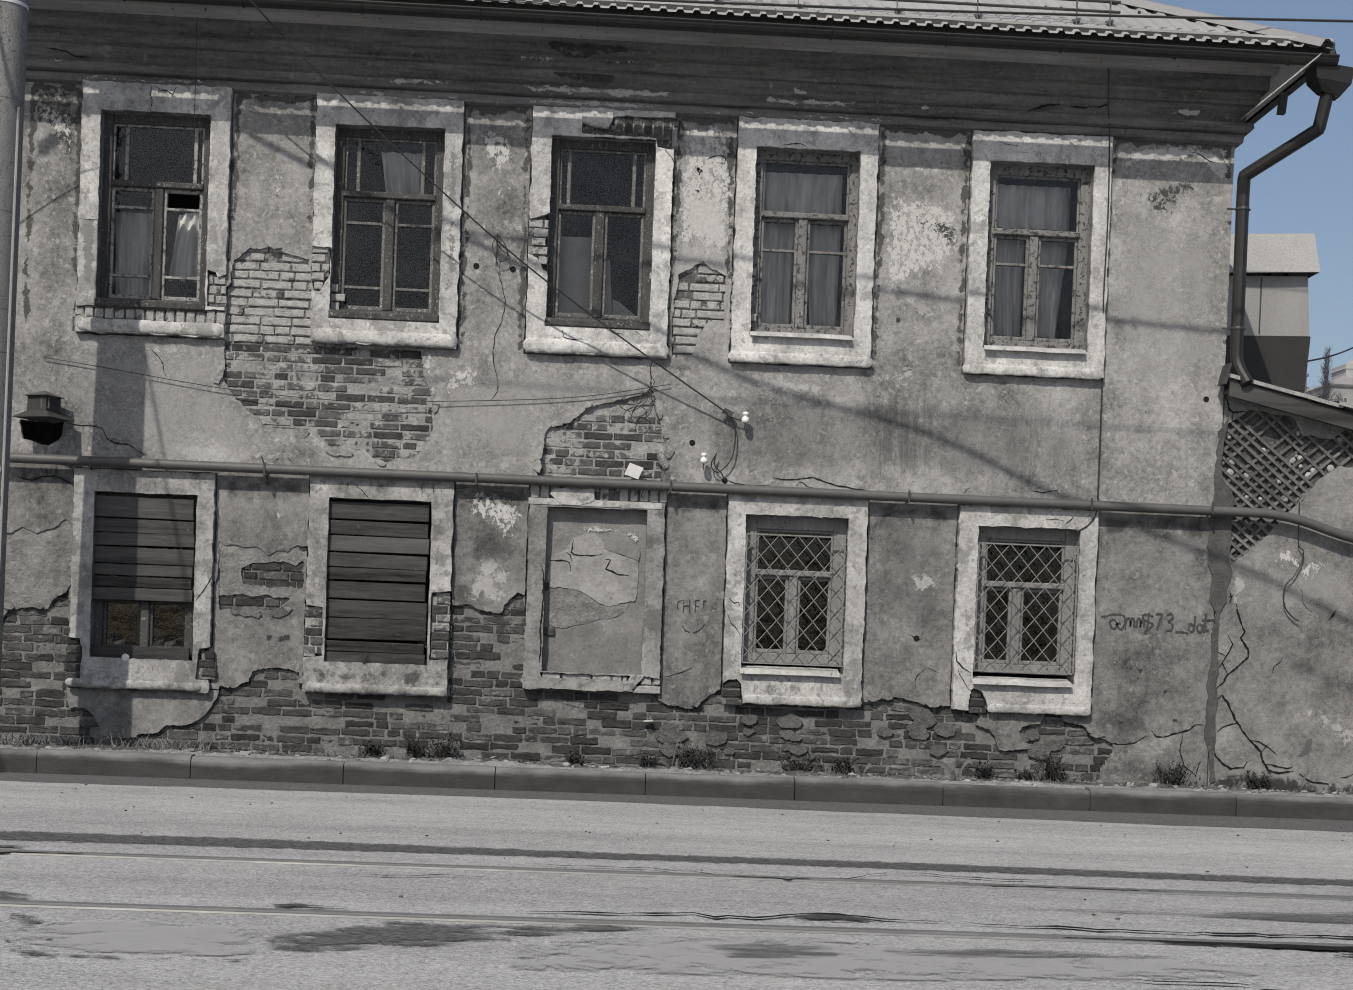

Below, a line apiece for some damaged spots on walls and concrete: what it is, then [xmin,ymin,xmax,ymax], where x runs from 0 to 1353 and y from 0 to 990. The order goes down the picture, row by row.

peeling [747,88,905,153]
peeling [82,218,96,290]
spalling [521,41,734,361]
spalling [21,420,64,448]
crack [67,423,146,456]
spalling [75,236,478,466]
spalling [467,390,675,537]
peeling [707,366,844,399]
spalling [1221,410,1353,604]
spalling [0,519,1116,783]
crack [1115,592,1353,784]